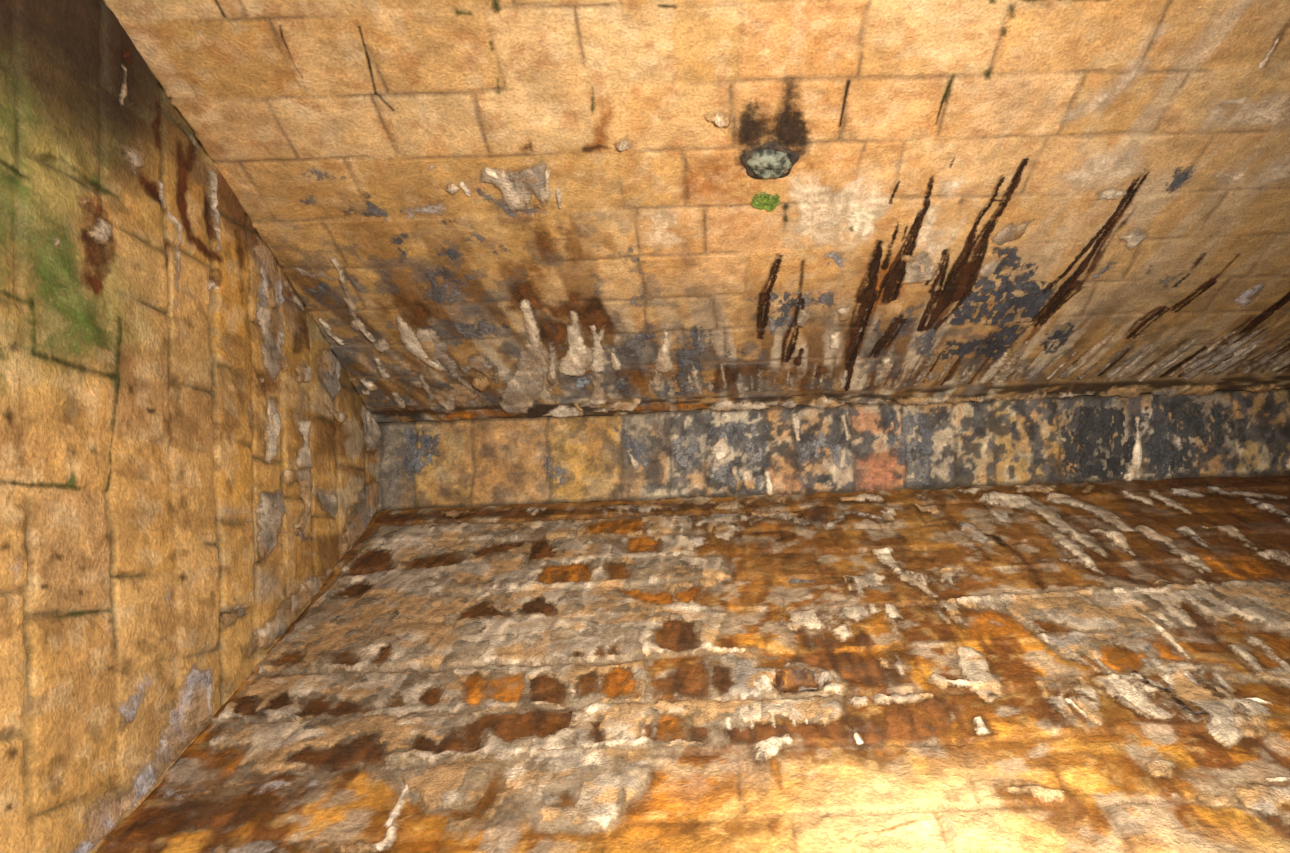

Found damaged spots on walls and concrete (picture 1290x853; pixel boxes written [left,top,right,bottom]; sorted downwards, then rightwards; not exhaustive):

water stain [123,101,221,308]
water stain [740,82,807,168]
water stain [72,153,1290,853]